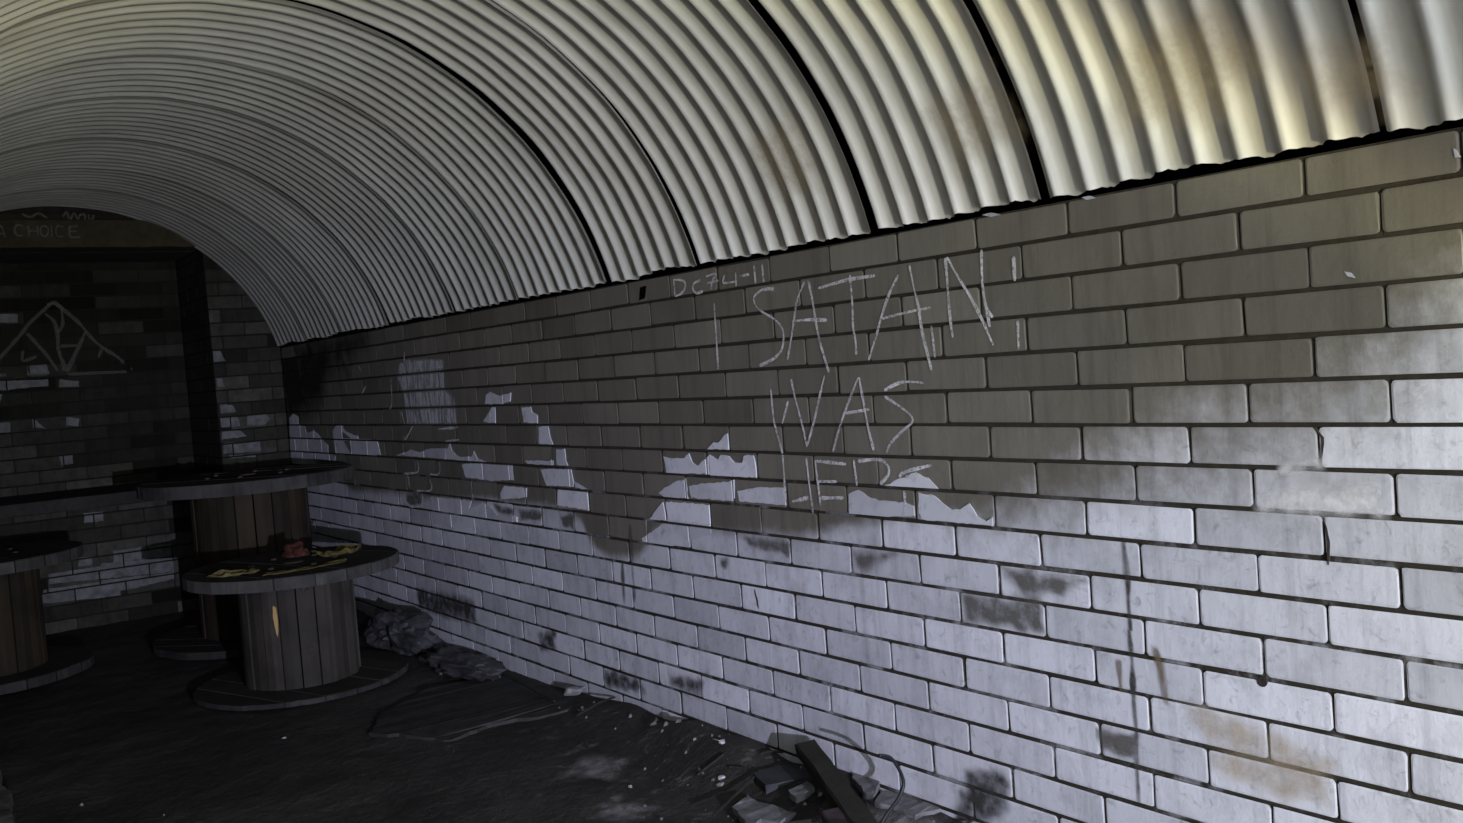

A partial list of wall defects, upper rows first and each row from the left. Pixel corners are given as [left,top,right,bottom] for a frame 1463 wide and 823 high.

peeling [0,314,18,323]
peeling [0,365,79,400]
peeling [66,417,79,426]
peeling [213,351,270,458]
peeling [289,392,589,530]
peeling [84,512,103,523]
peeling [642,434,786,546]
peeling [848,472,994,526]
peeling [42,543,174,603]
peeling [747,538,790,556]